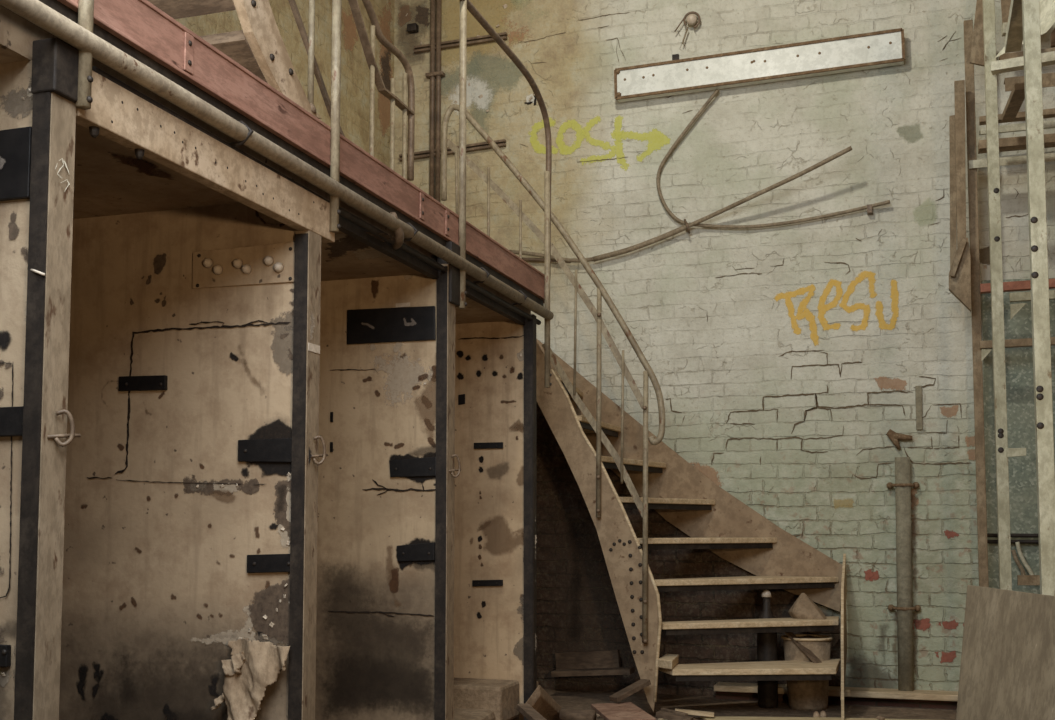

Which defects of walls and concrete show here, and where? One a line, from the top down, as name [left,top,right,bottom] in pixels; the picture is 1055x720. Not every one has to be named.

crack [711,350,970,479]
crack [362,479,436,495]
flaking render [209,576,290,720]